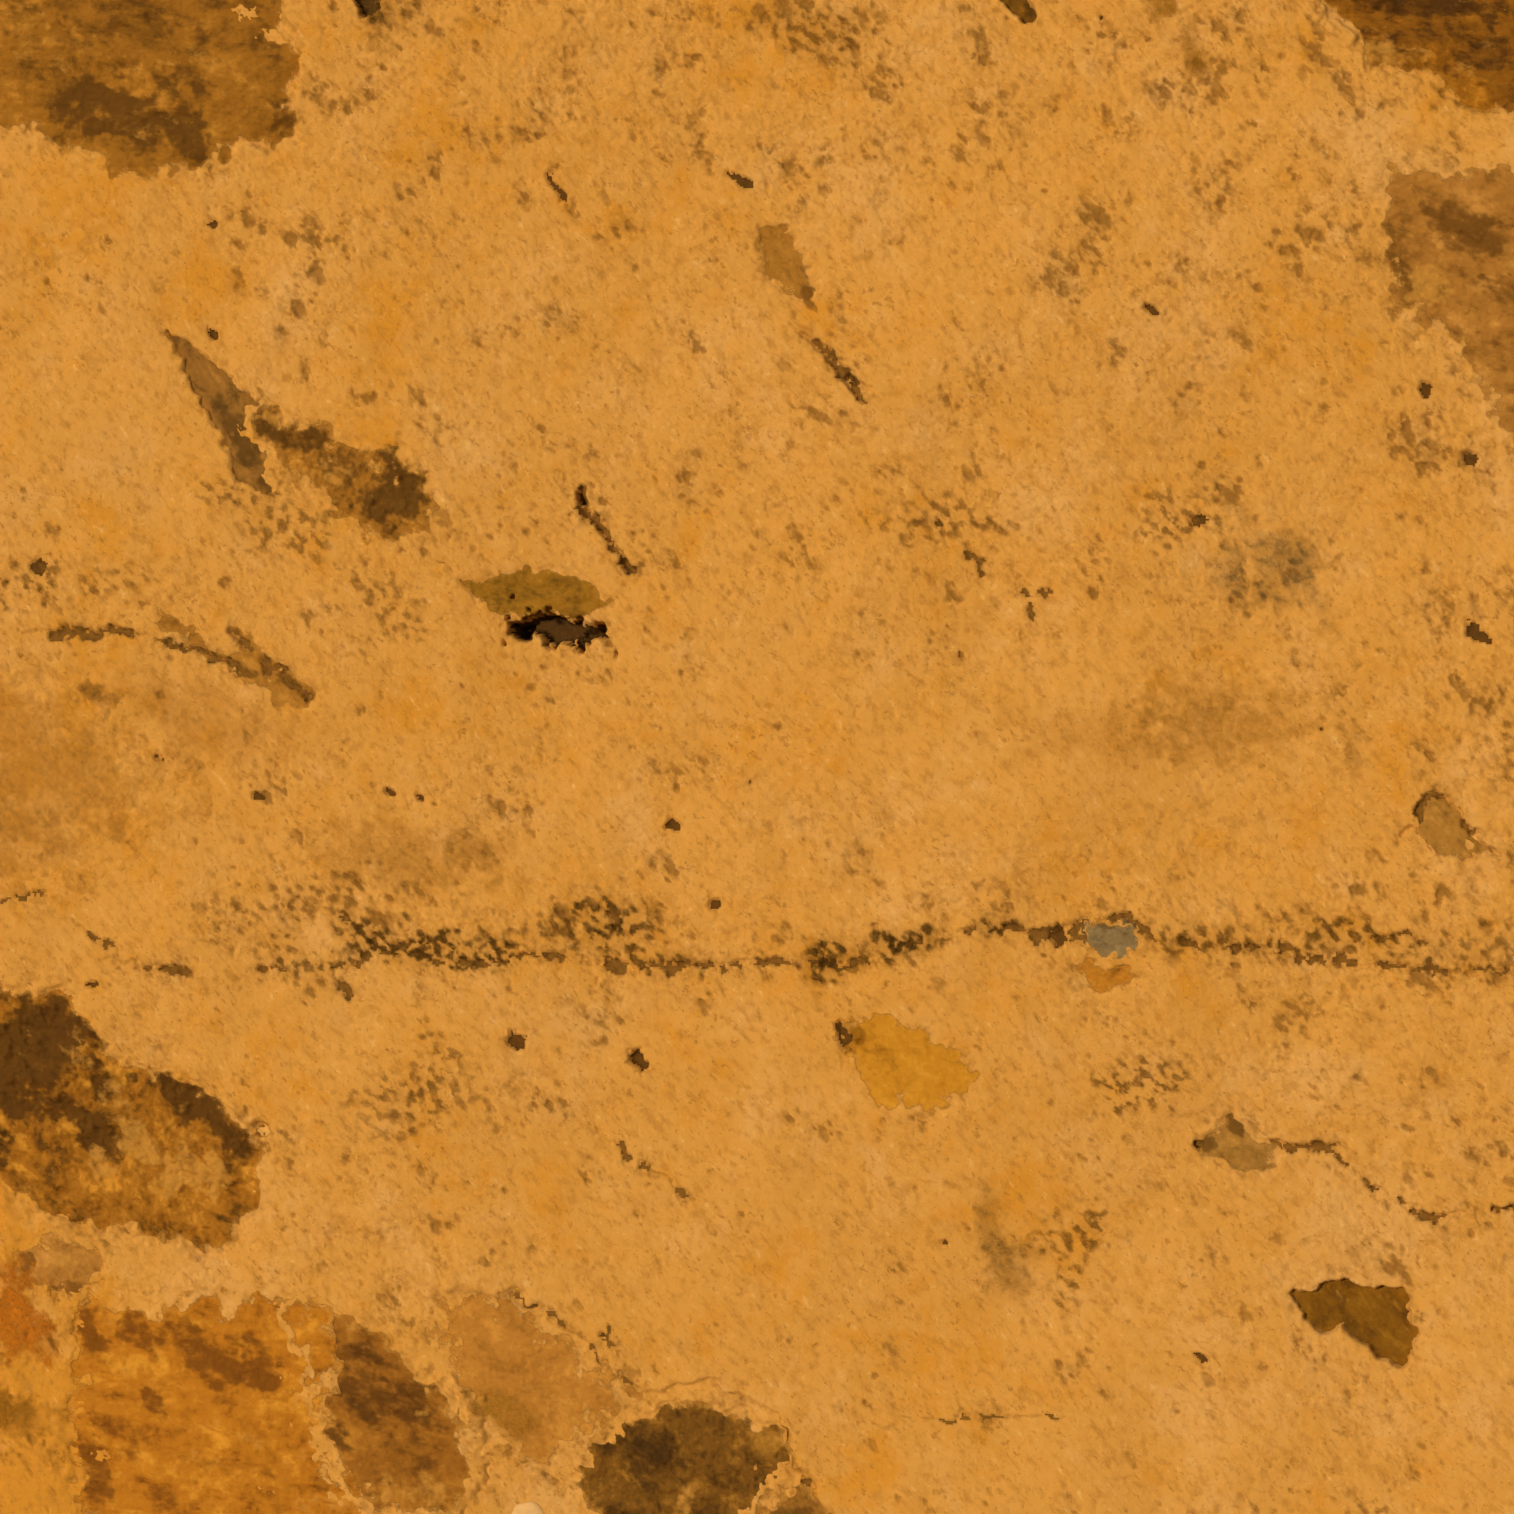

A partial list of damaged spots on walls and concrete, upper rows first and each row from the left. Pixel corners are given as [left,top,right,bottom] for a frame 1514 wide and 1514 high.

flaking render [0,0,316,195]
flaking render [1316,0,1514,135]
flaking render [1357,146,1514,482]
flaking render [151,311,625,651]
crack [86,931,192,978]
crack [331,910,566,1001]
crack [602,896,923,978]
crack [964,911,1510,978]
crack [1283,1140,1447,1225]
flaking render [0,974,835,1514]
crack [513,1292,633,1385]
flaking render [1292,1279,1418,1366]